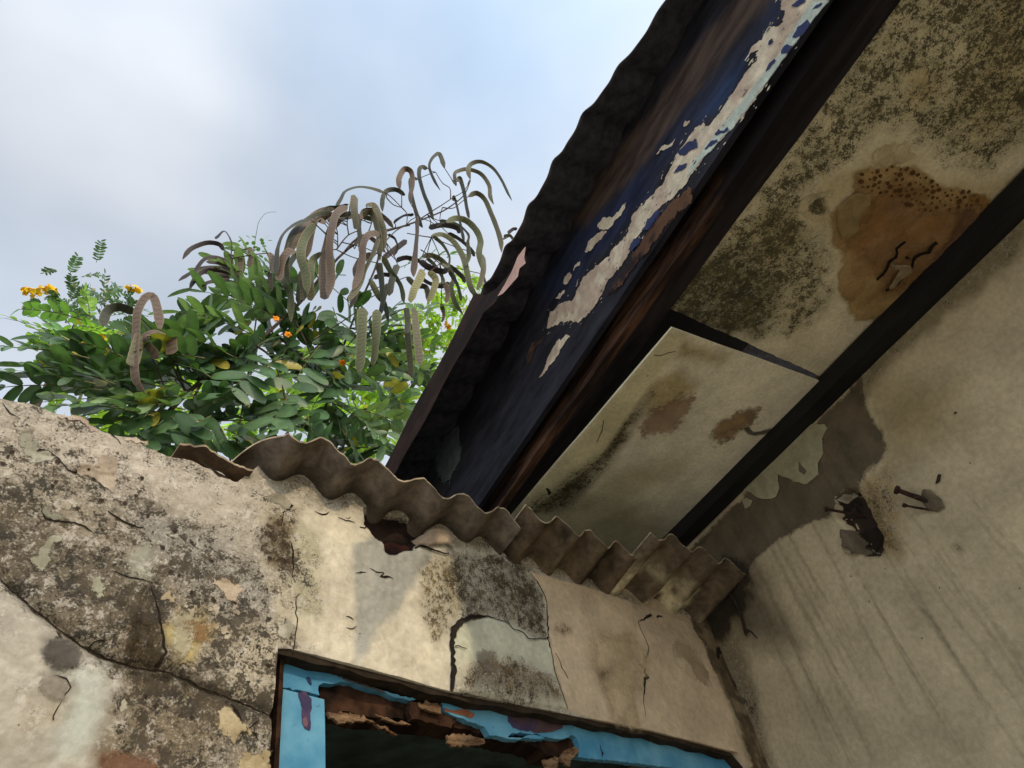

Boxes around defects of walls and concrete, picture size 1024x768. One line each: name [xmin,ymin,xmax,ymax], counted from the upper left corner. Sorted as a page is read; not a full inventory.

peeling [526,0,828,378]
leakage [831,166,989,321]
peeling [690,378,897,571]
spalling [364,515,453,555]
leakage [419,551,573,641]
crack [0,571,270,741]
peeling [444,708,475,718]
peeling [476,649,500,678]
peeling [508,716,563,733]
crack [638,613,663,716]